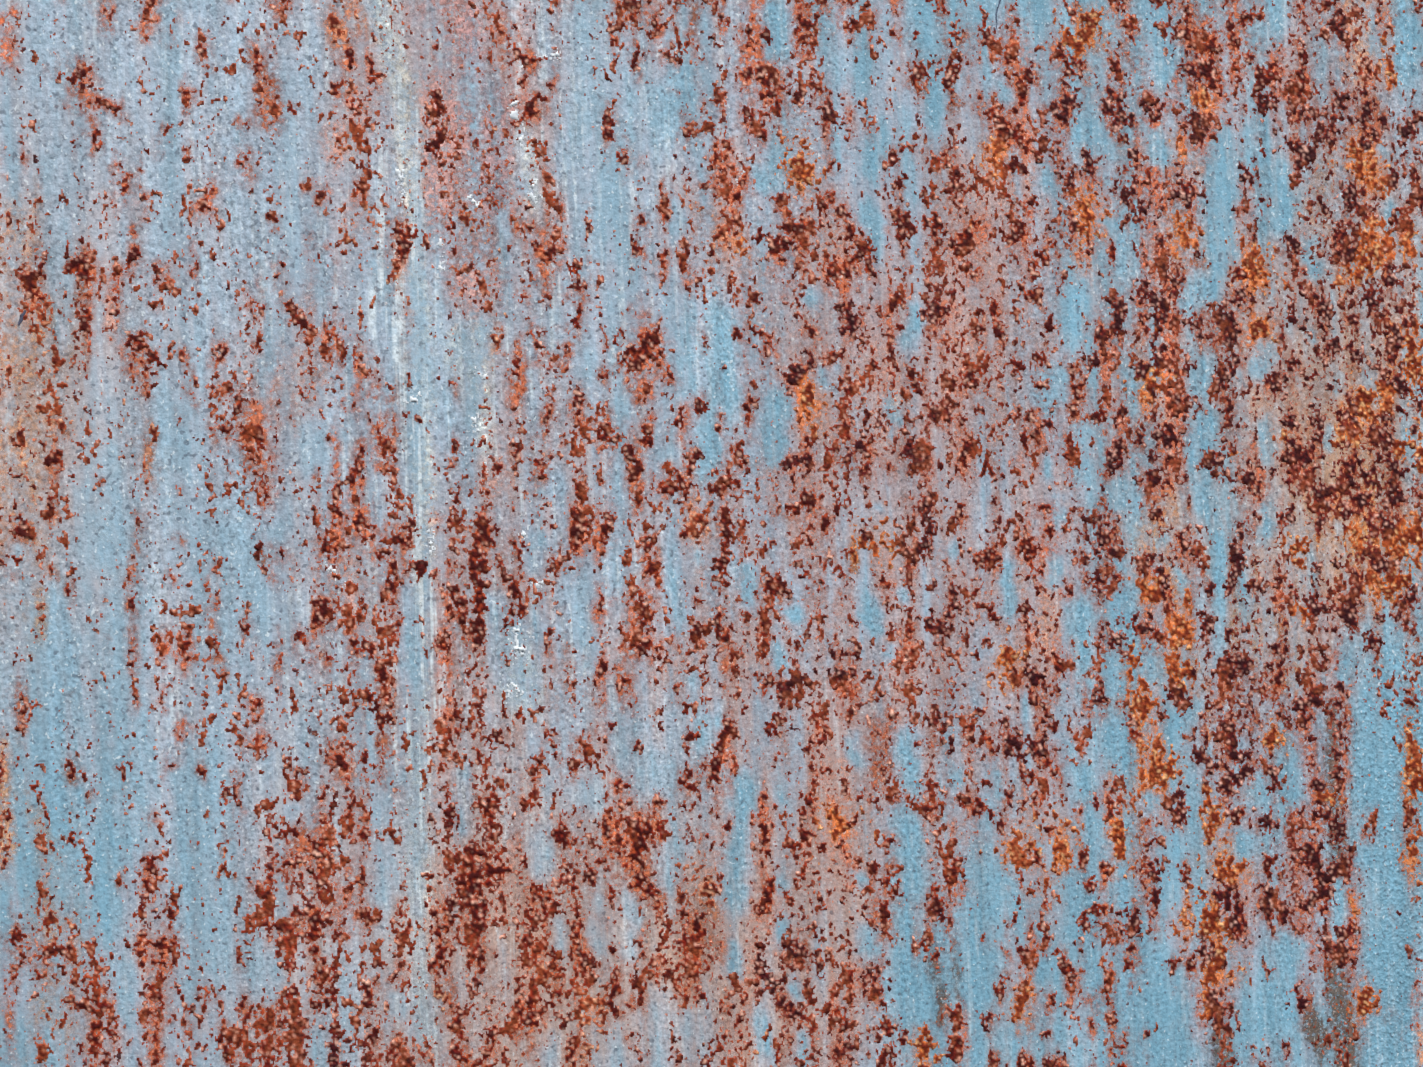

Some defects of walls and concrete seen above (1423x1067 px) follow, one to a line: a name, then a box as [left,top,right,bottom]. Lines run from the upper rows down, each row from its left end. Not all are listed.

corrosion [125,0,175,42]
corrosion [0,5,66,174]
corrosion [55,48,149,171]
corrosion [109,148,143,196]
corrosion [263,182,287,246]
corrosion [118,423,160,501]
corrosion [234,596,257,661]
corrosion [51,720,102,799]
corrosion [106,711,143,826]
corrosion [212,840,237,879]
corrosion [0,763,133,1067]
corrosion [665,1013,687,1066]